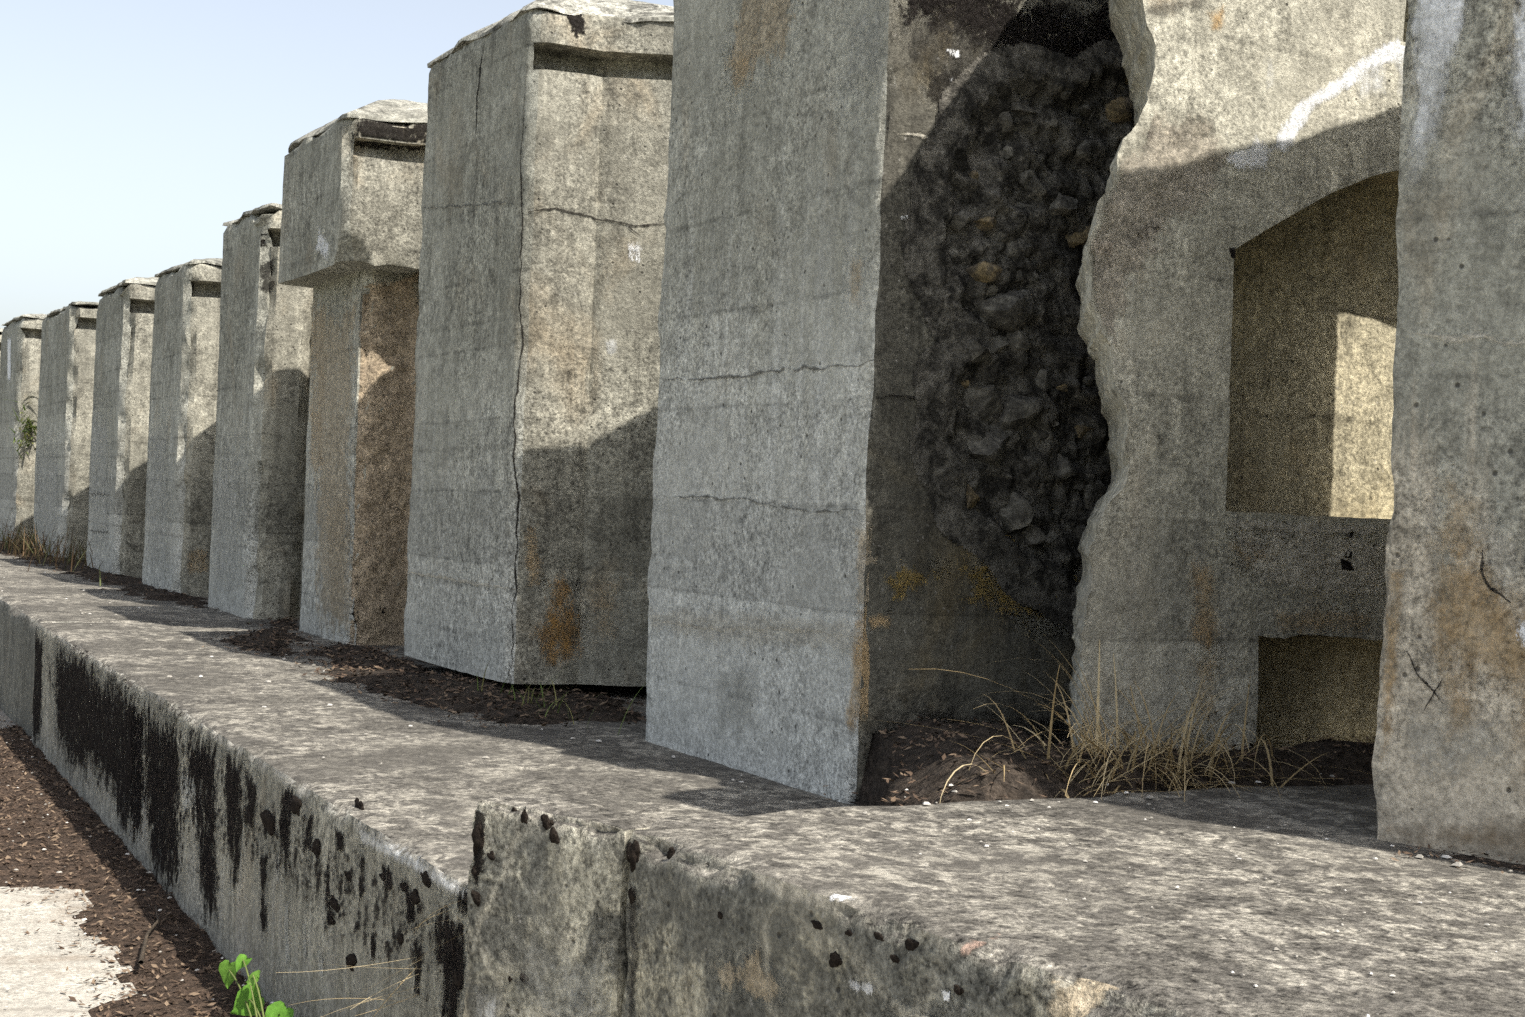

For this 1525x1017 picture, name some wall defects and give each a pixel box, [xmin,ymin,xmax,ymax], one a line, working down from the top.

crack [475,46,484,137]
damp [1228,0,1464,169]
damp [1514,5,1525,133]
crack [421,71,664,673]
spalling [894,0,1227,635]
damp [125,686,145,847]
damp [257,784,294,937]
damp [323,868,332,933]
damp [335,828,364,903]
damp [382,862,421,996]
damp [454,888,468,923]